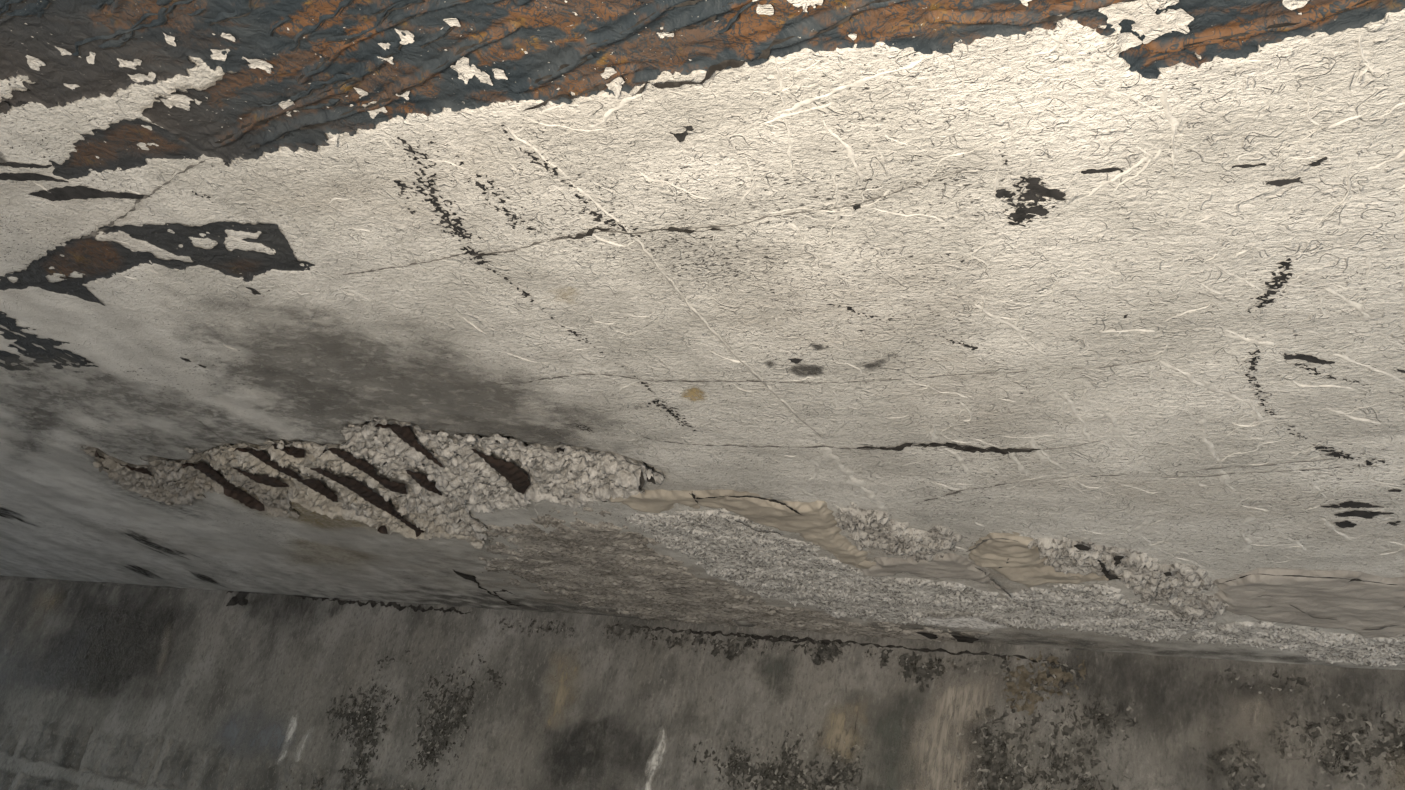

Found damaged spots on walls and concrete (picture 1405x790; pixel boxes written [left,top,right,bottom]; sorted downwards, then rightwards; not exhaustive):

peeling [0,0,1405,201]
crack [342,165,982,275]
peeling [995,178,1066,222]
peeling [0,221,315,306]
peeling [0,311,98,377]
crack [496,360,1152,385]
crack [1162,459,1377,478]
spalling [80,418,1405,667]